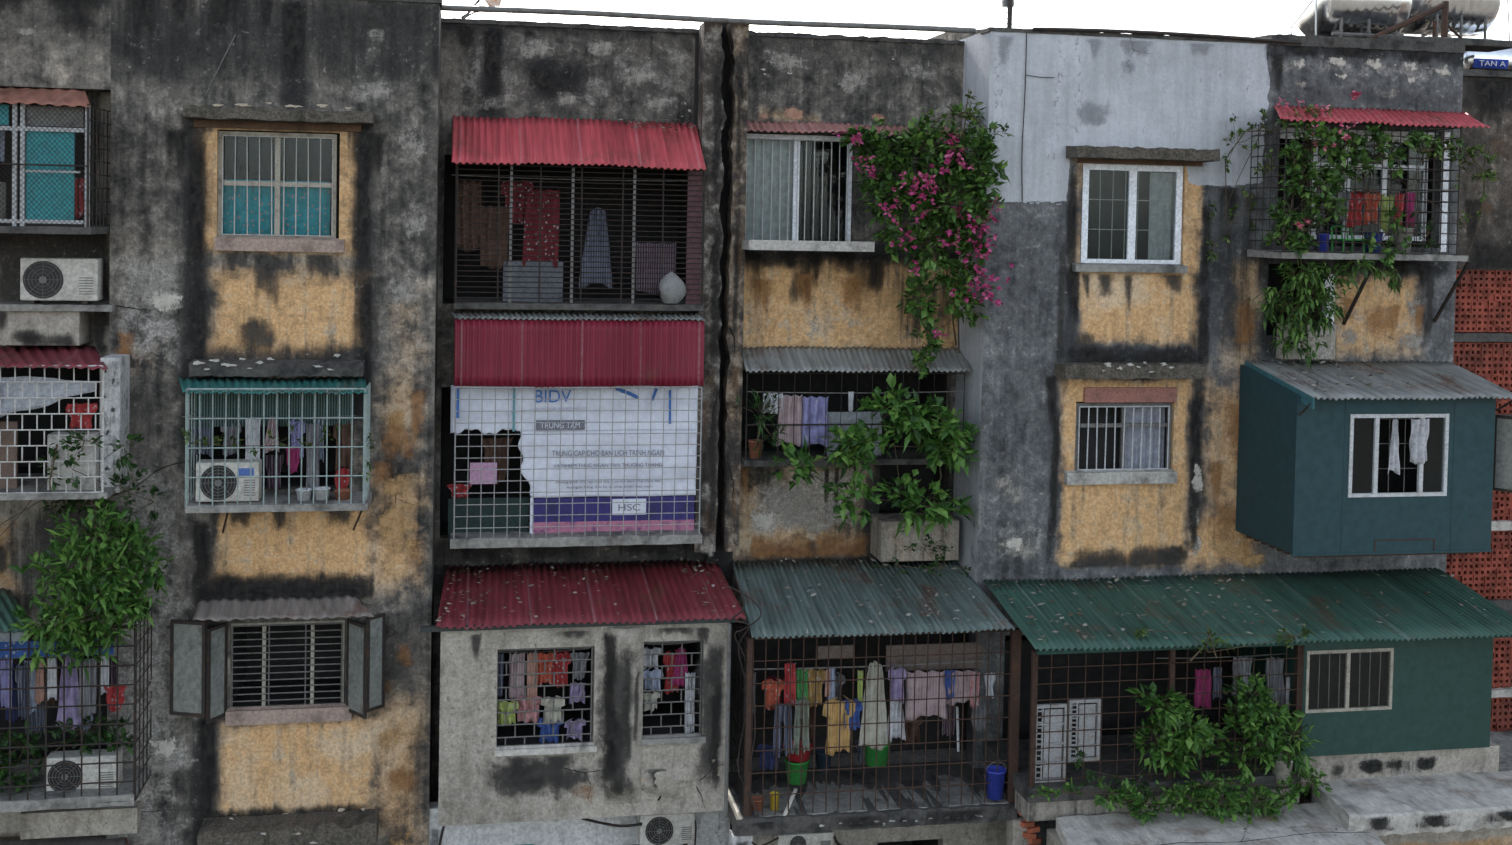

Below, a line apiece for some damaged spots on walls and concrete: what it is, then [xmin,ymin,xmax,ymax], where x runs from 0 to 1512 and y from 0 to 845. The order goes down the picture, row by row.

leakage [57,0,96,32]
leakage [127,0,305,72]
leakage [241,318,274,349]
leakage [255,255,277,301]
leakage [307,255,331,276]
crack [705,23,744,567]
leakage [711,210,886,359]
leakage [1057,176,1237,364]
leakage [1046,377,1060,534]
leakage [1070,397,1203,567]
leakage [472,635,481,656]
leakage [493,634,639,799]